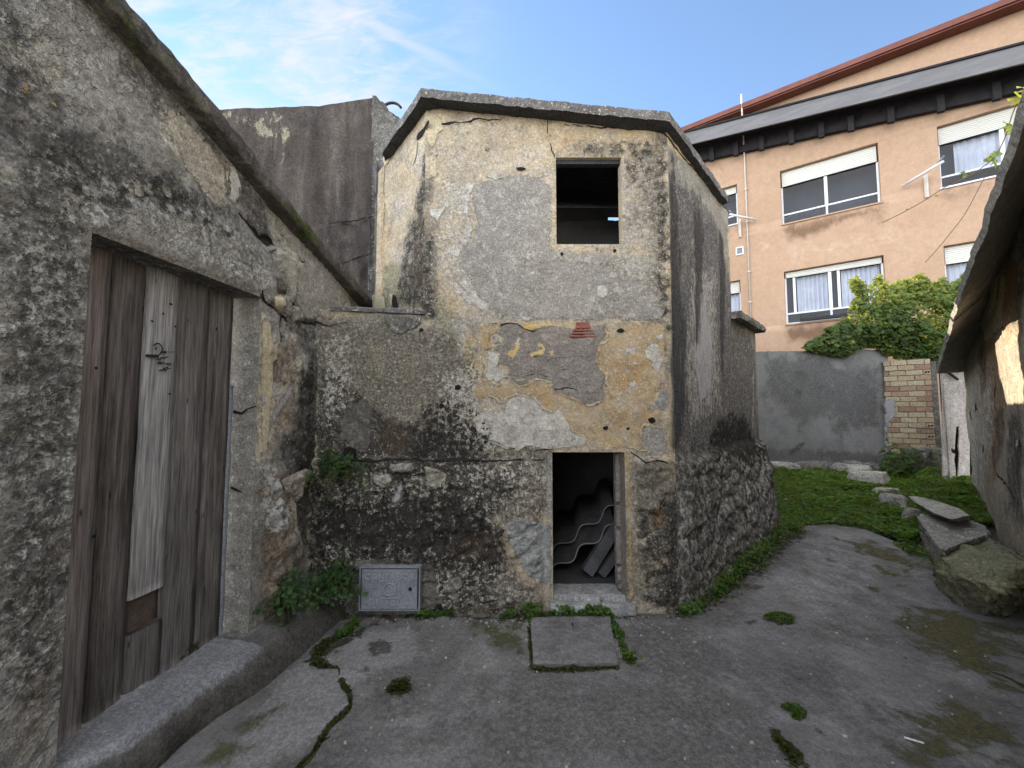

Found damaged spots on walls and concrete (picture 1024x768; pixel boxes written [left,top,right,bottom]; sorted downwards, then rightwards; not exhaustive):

flaking render [409,118,443,164]
crack [416,116,505,140]
flaking render [429,205,445,221]
crack [239,213,346,338]
flaking render [450,172,668,451]
leakage [670,183,726,452]
leakage [384,399,499,461]
crack [353,447,549,489]
leakage [710,413,765,464]
leakage [310,472,512,572]